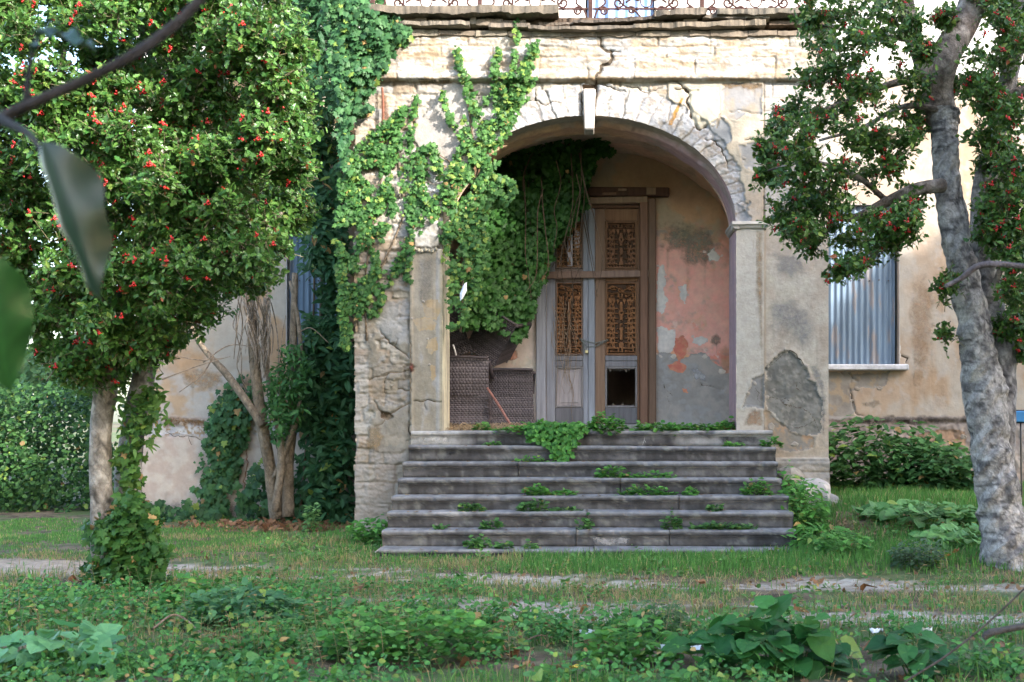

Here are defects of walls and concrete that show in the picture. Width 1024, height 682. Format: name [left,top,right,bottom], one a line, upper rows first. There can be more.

crack [529,37,728,168]
spalling [688,81,763,171]
peeling [702,248,723,261]
spalling [656,264,729,429]
spalling [742,348,890,452]